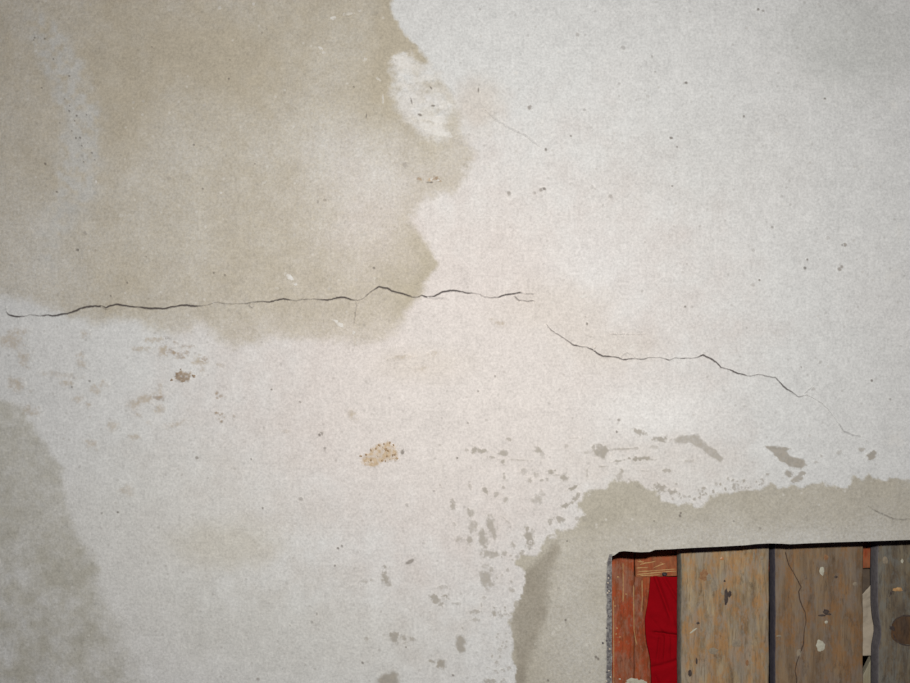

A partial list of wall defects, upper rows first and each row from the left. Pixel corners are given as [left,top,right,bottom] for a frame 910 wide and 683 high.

water stain [0,0,480,376]
crack [4,285,537,327]
crack [546,323,864,438]
peeling [427,426,910,683]